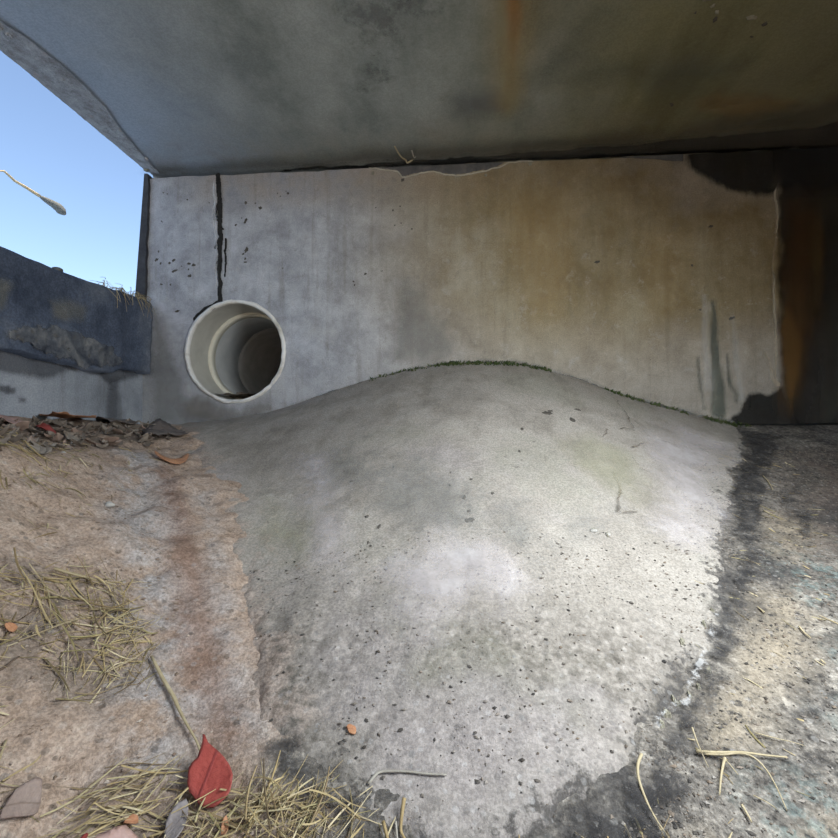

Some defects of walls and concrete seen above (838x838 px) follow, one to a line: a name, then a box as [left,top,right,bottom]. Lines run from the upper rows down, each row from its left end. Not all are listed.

crack [193,173,227,321]
water stain [282,121,838,657]
water stain [266,737,362,822]
water stain [577,758,691,838]